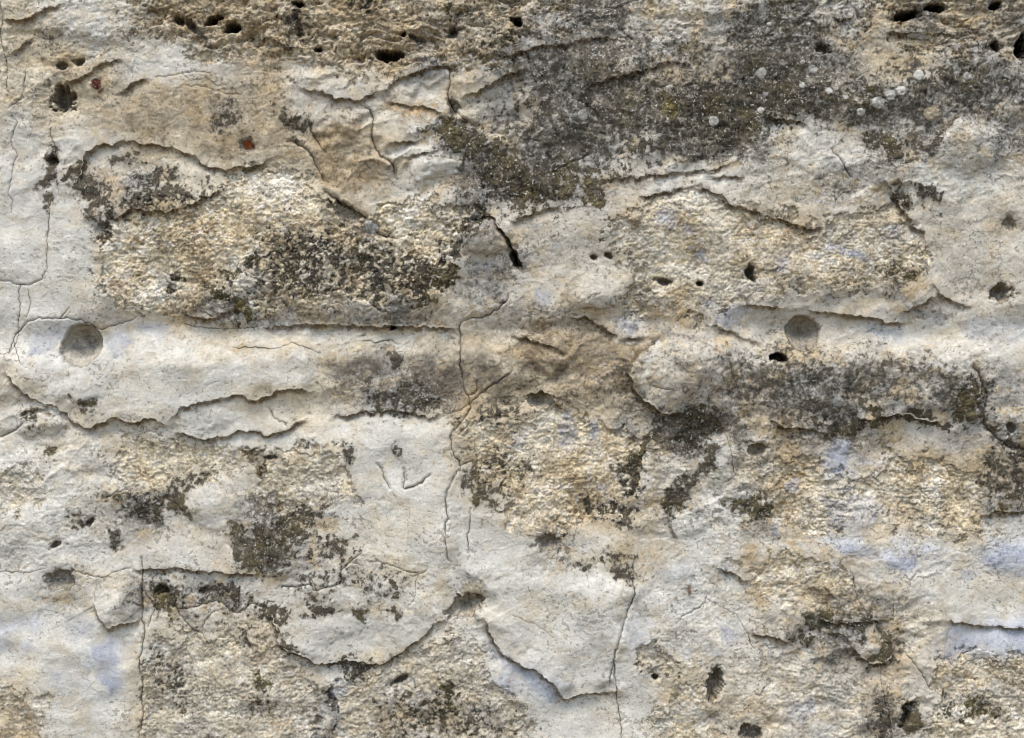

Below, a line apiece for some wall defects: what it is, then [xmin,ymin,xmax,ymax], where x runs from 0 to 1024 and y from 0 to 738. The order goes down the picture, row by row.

leakage [470,25,517,58]
crack [0,201,131,363]
leakage [427,117,486,152]
crack [479,214,524,270]
leakage [581,166,606,211]
leakage [572,49,1024,164]
leakage [875,261,928,299]
leakage [890,179,944,216]
spalling [0,367,364,523]
crack [444,295,509,561]
spalling [138,611,618,738]
crack [609,571,636,733]